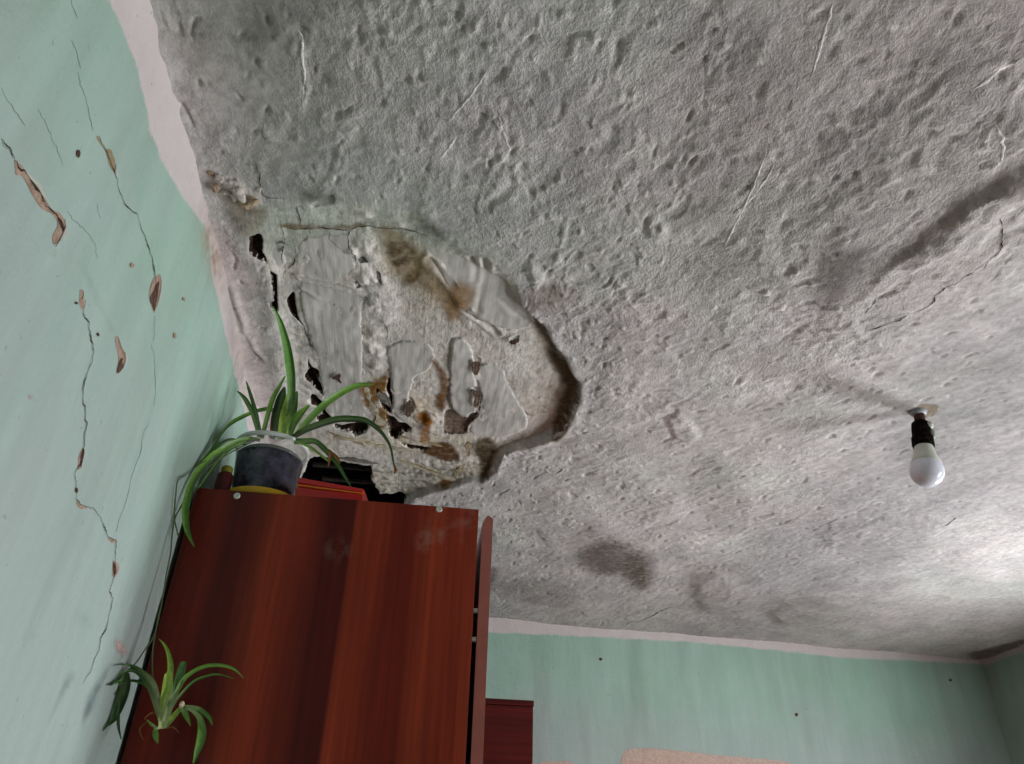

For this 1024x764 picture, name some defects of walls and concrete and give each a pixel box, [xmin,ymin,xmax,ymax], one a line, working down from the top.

peeling [2,139,68,246]
peeling [97,136,163,339]
damp [386,237,448,301]
crack [864,219,1016,330]
peeling [115,337,128,374]
spalling [207,170,586,505]
peeling [75,289,119,679]